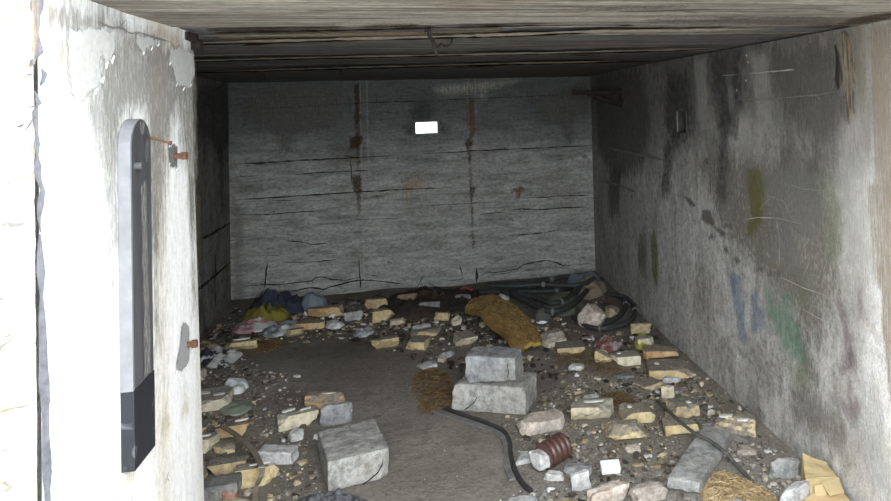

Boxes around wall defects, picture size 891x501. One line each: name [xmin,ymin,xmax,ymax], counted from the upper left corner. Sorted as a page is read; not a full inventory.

water stain [48,0,108,32]
peeling [67,27,116,104]
peeling [169,45,195,91]
crack [198,223,231,304]
corrosion [348,85,362,162]
corrosion [352,174,362,208]
water stain [91,14,650,378]
crack [237,155,586,295]
crack [424,145,589,160]
spalling [175,323,190,381]